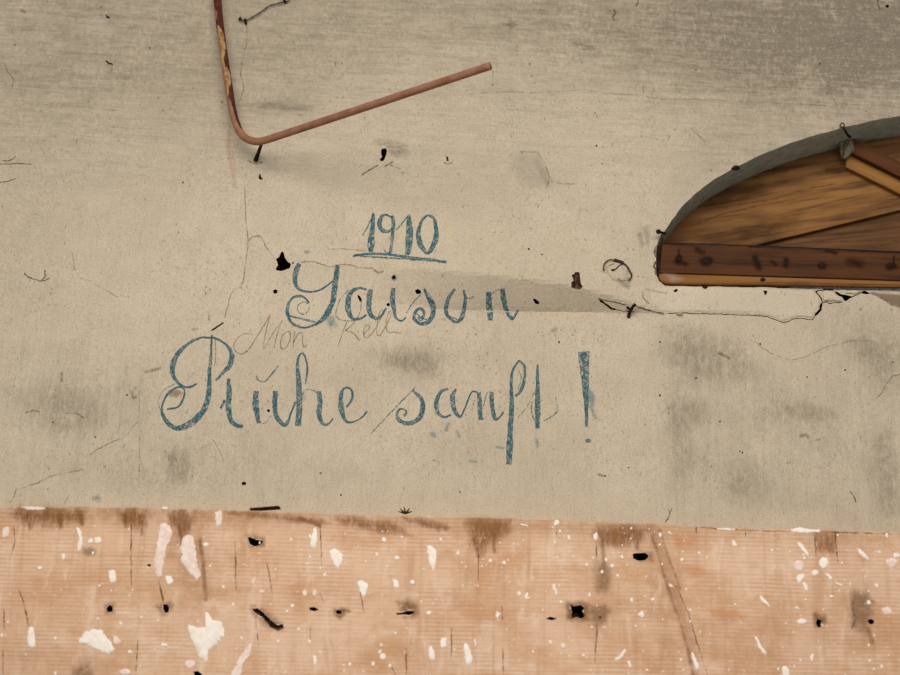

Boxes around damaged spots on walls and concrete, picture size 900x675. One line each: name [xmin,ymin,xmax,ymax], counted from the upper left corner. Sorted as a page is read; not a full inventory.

crack [598,235,861,323]
damp [16,509,83,525]
damp [472,520,506,550]